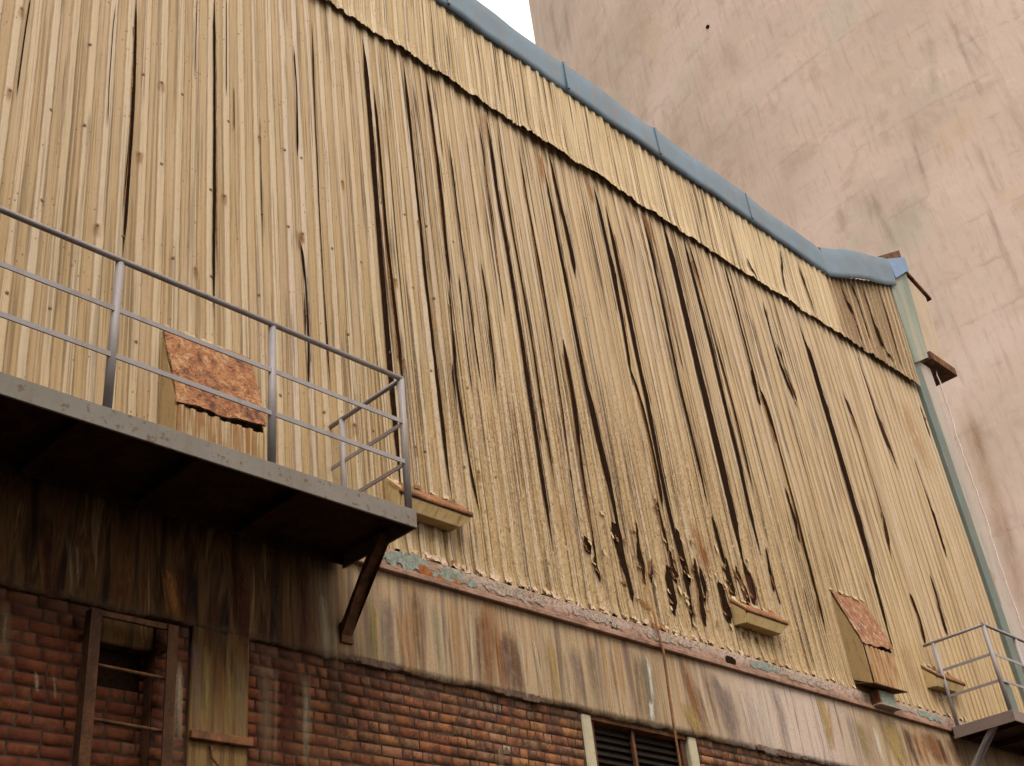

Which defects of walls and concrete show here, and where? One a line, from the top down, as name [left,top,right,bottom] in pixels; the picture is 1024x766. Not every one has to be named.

peeling [383,532,872,692]
leakage [641,657,655,723]
corrosion [906,731,961,765]